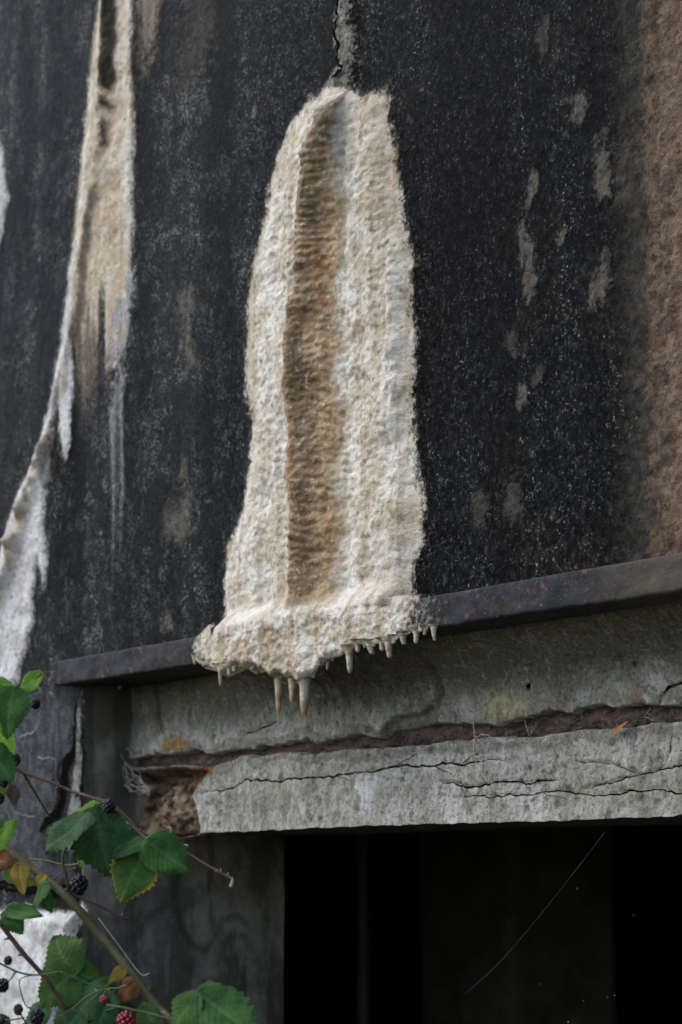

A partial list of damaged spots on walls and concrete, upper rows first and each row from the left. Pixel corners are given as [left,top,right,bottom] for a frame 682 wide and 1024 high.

crack [324,0,358,89]
damp [0,0,162,685]
damp [190,79,439,716]
spalling [129,707,682,837]
crack [208,736,682,799]